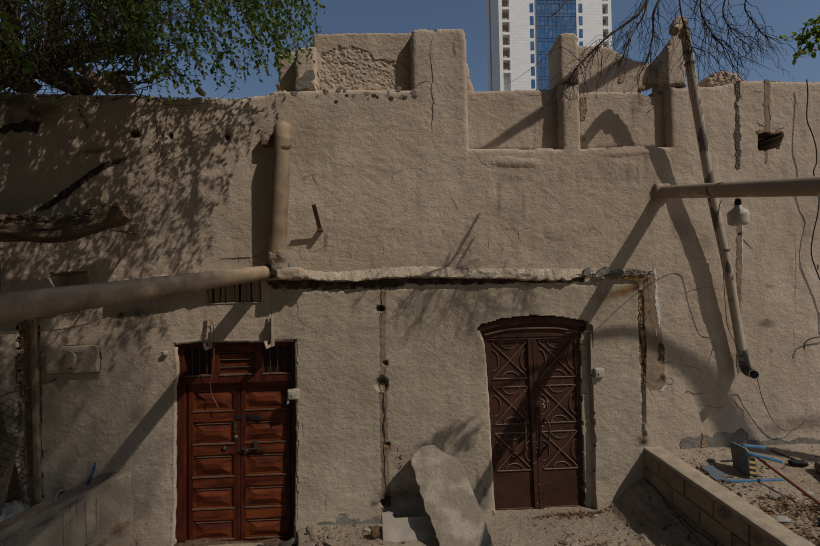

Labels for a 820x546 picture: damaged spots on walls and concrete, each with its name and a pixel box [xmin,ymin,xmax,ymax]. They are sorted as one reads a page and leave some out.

crack [418,29,454,121]
peeling [0,119,41,134]
spalling [578,267,654,282]
spalling [13,320,44,479]
spalling [680,428,820,449]